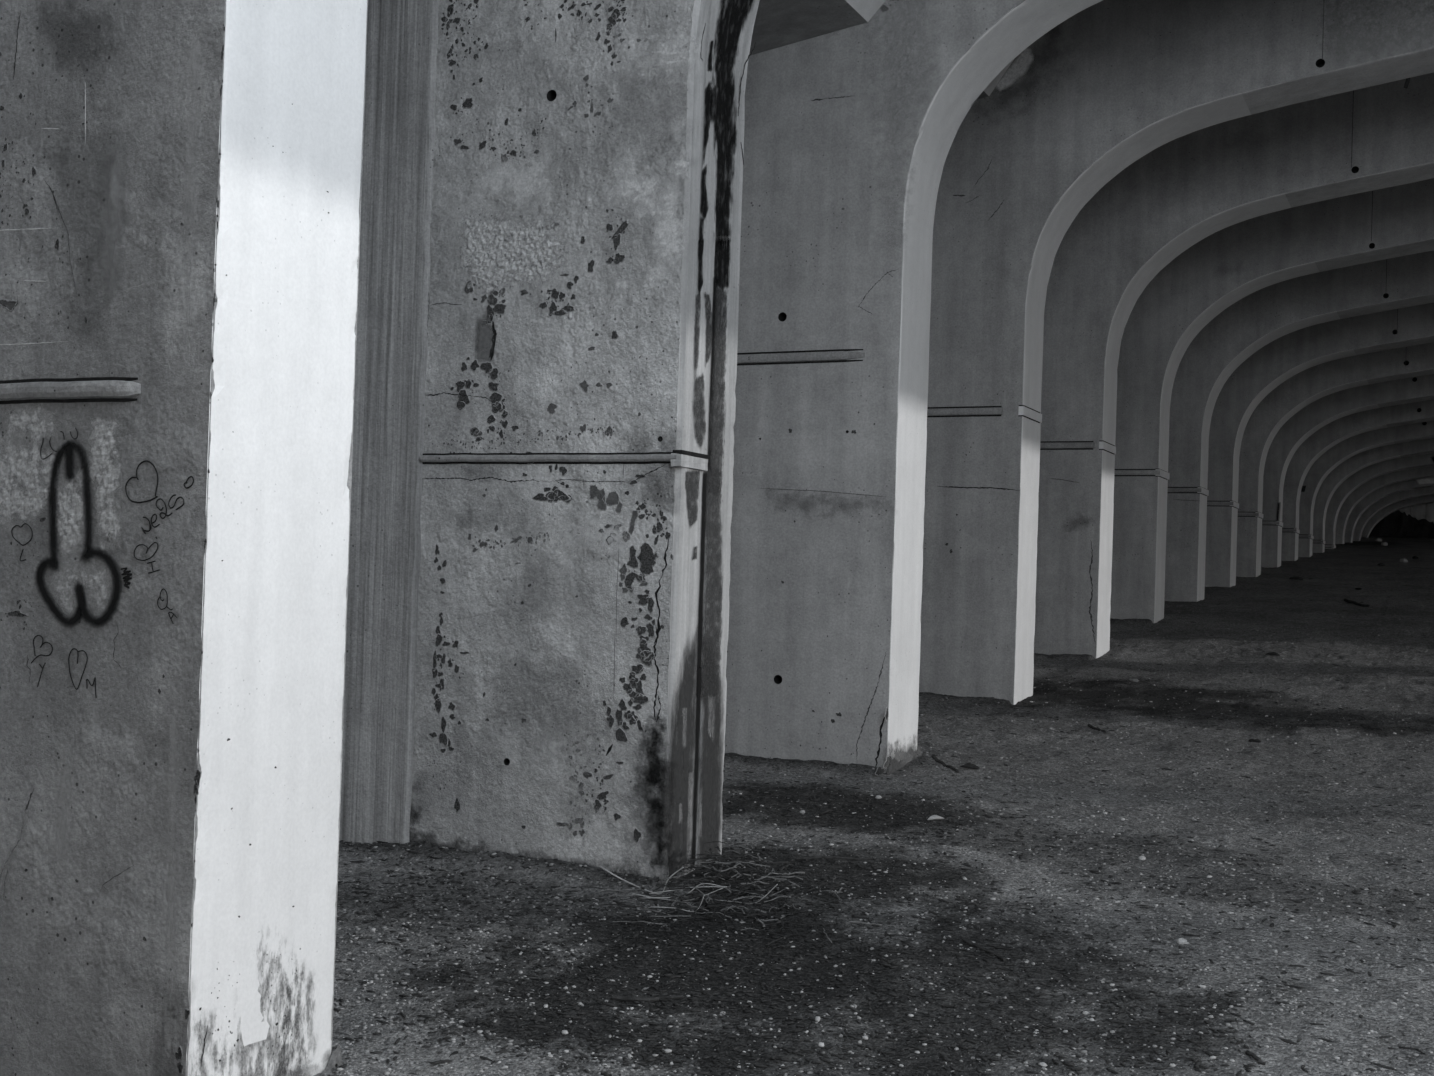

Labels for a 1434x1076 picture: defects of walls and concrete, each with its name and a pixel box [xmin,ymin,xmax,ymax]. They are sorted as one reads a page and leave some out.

peeling [459,206,635,328]
peeling [685,287,727,698]
peeling [434,544,447,594]
peeling [429,612,482,814]
water stain [637,472,723,885]
crack [856,652,886,767]
water stain [199,961,311,1076]